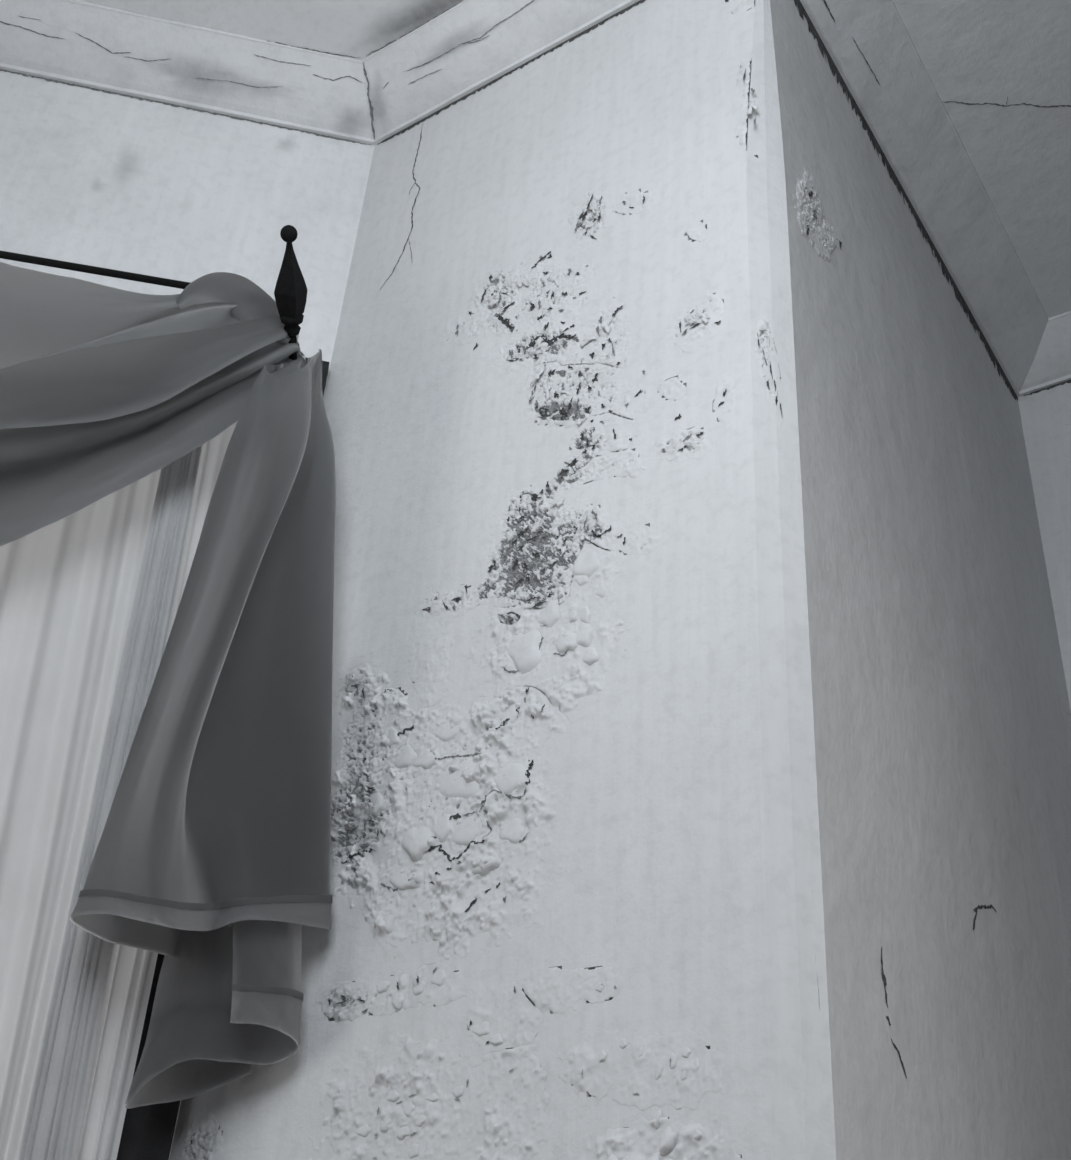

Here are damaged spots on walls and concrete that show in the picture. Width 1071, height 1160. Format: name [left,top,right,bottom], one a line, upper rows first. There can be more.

crack [0,0,645,289]
peeling [731,51,758,158]
crack [794,0,1071,401]
peeling [665,290,726,353]
peeling [654,372,736,463]
spalling [330,179,688,960]
peeling [175,1107,225,1160]